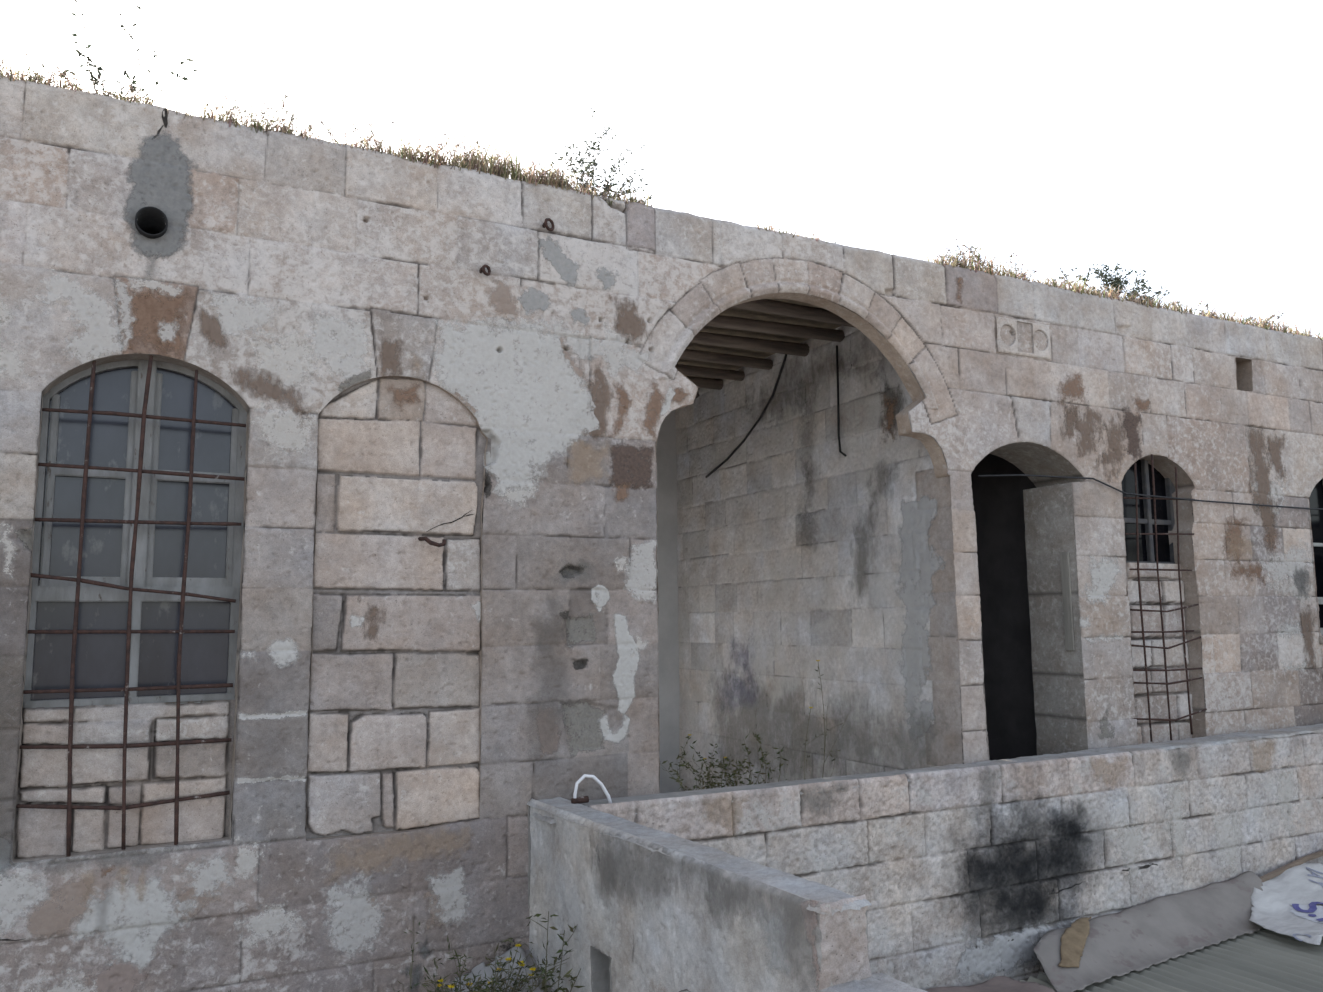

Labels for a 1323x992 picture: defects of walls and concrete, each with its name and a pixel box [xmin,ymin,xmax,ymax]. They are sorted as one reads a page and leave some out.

water stain [490,281,518,315]
water stain [560,337,690,500]
water stain [1057,374,1150,480]
spalling [559,565,586,578]
peeling [615,541,658,601]
water stain [1225,519,1244,561]
water stain [1248,429,1285,550]
water stain [1295,570,1318,673]